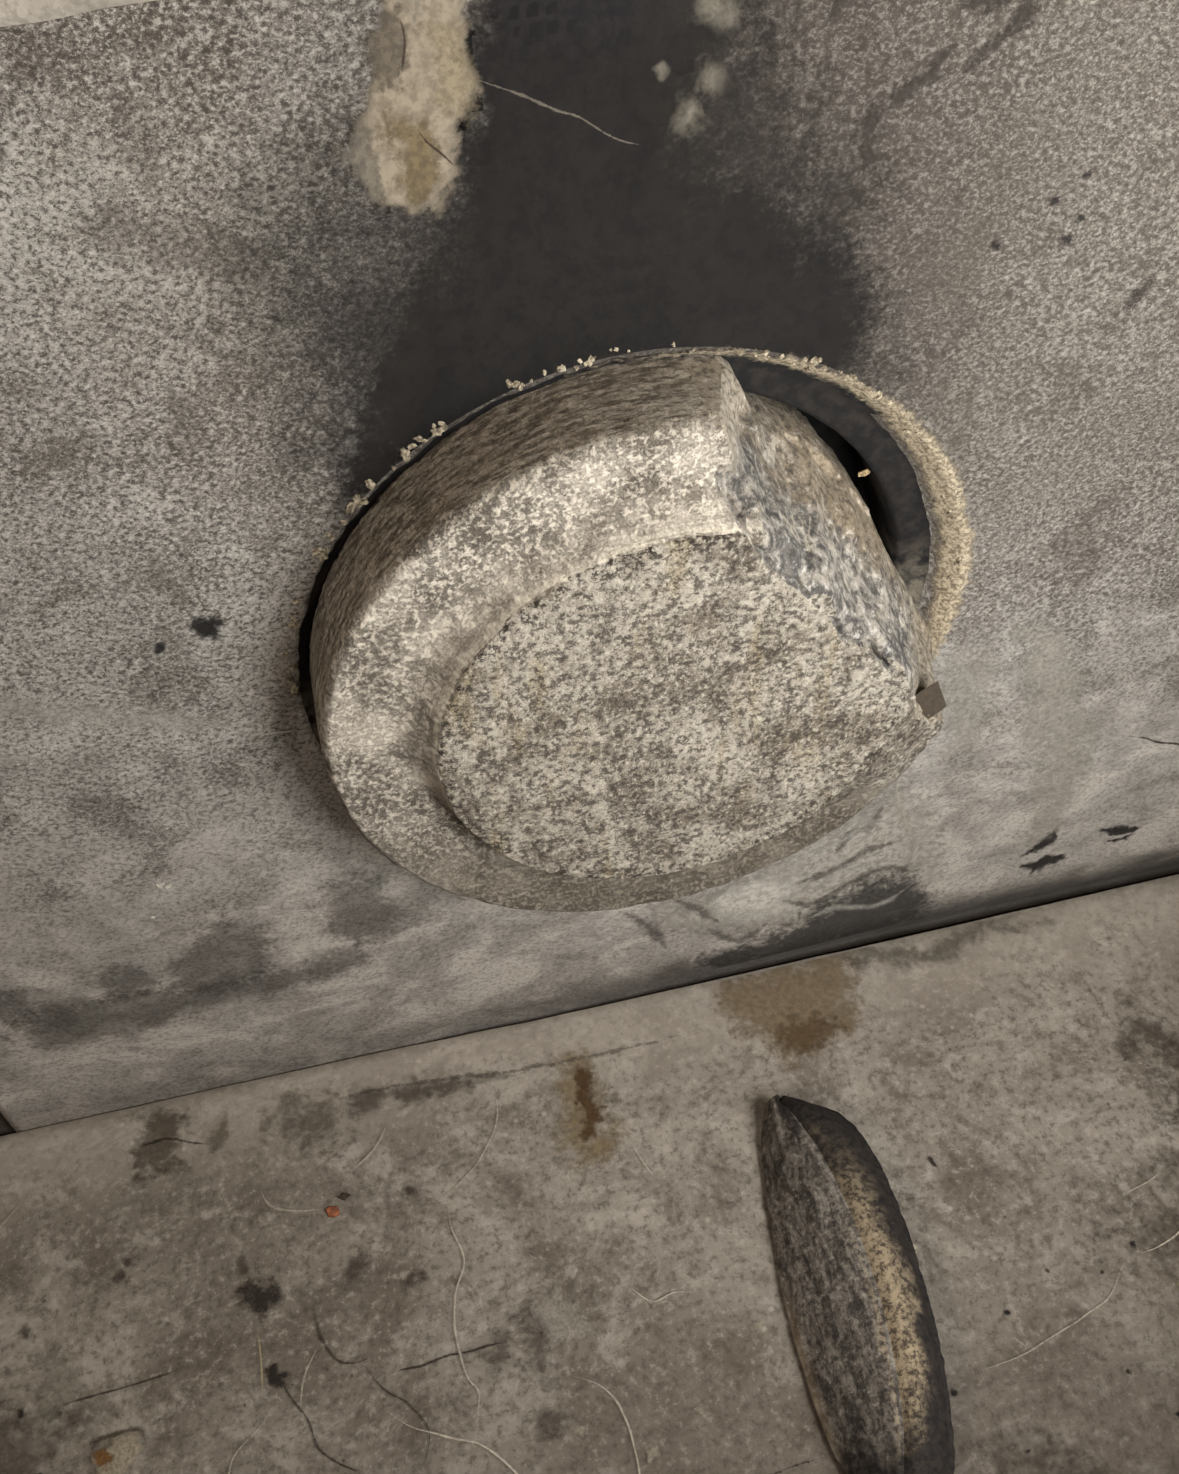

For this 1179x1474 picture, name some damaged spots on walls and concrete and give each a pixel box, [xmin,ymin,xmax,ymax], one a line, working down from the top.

water stain [966,0,1036,67]
peeling [341,0,482,215]
water stain [860,46,954,171]
water stain [291,0,857,484]
crack [1140,737,1179,745]
water stain [697,867,933,968]
corrosion [719,955,857,1065]
corrosion [559,1054,619,1163]